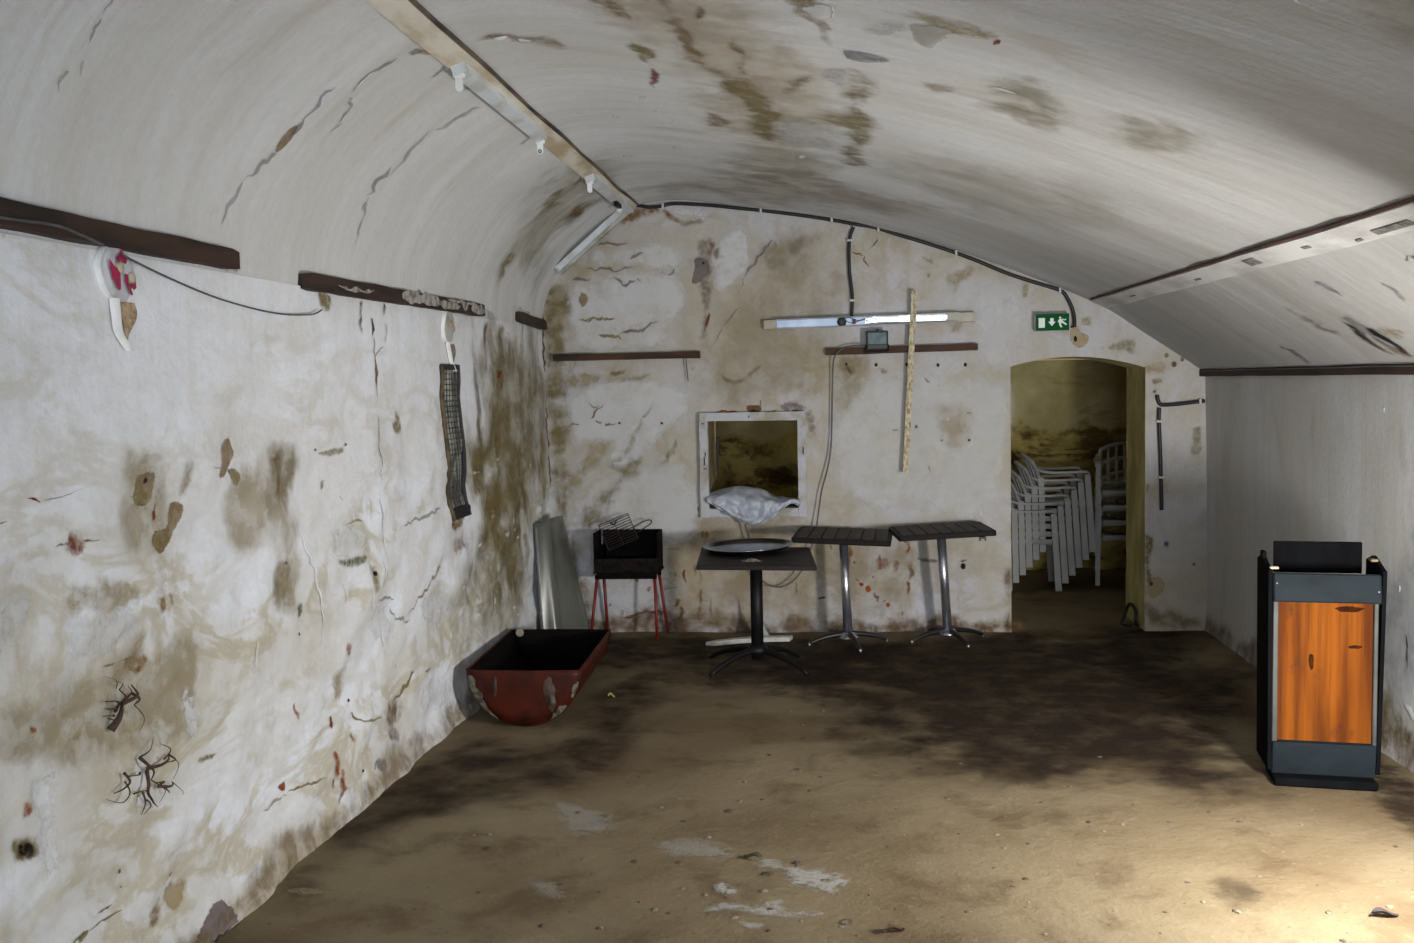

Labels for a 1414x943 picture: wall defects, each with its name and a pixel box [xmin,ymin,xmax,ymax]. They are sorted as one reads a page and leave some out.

leakage [630,44,659,85]
leakage [716,72,781,140]
leakage [831,93,870,166]
spalling [692,258,709,284]
spalling [213,438,240,486]
leakage [465,287,643,608]
spalling [133,472,183,554]
leakage [1375,697,1414,822]
spalling [197,899,239,943]